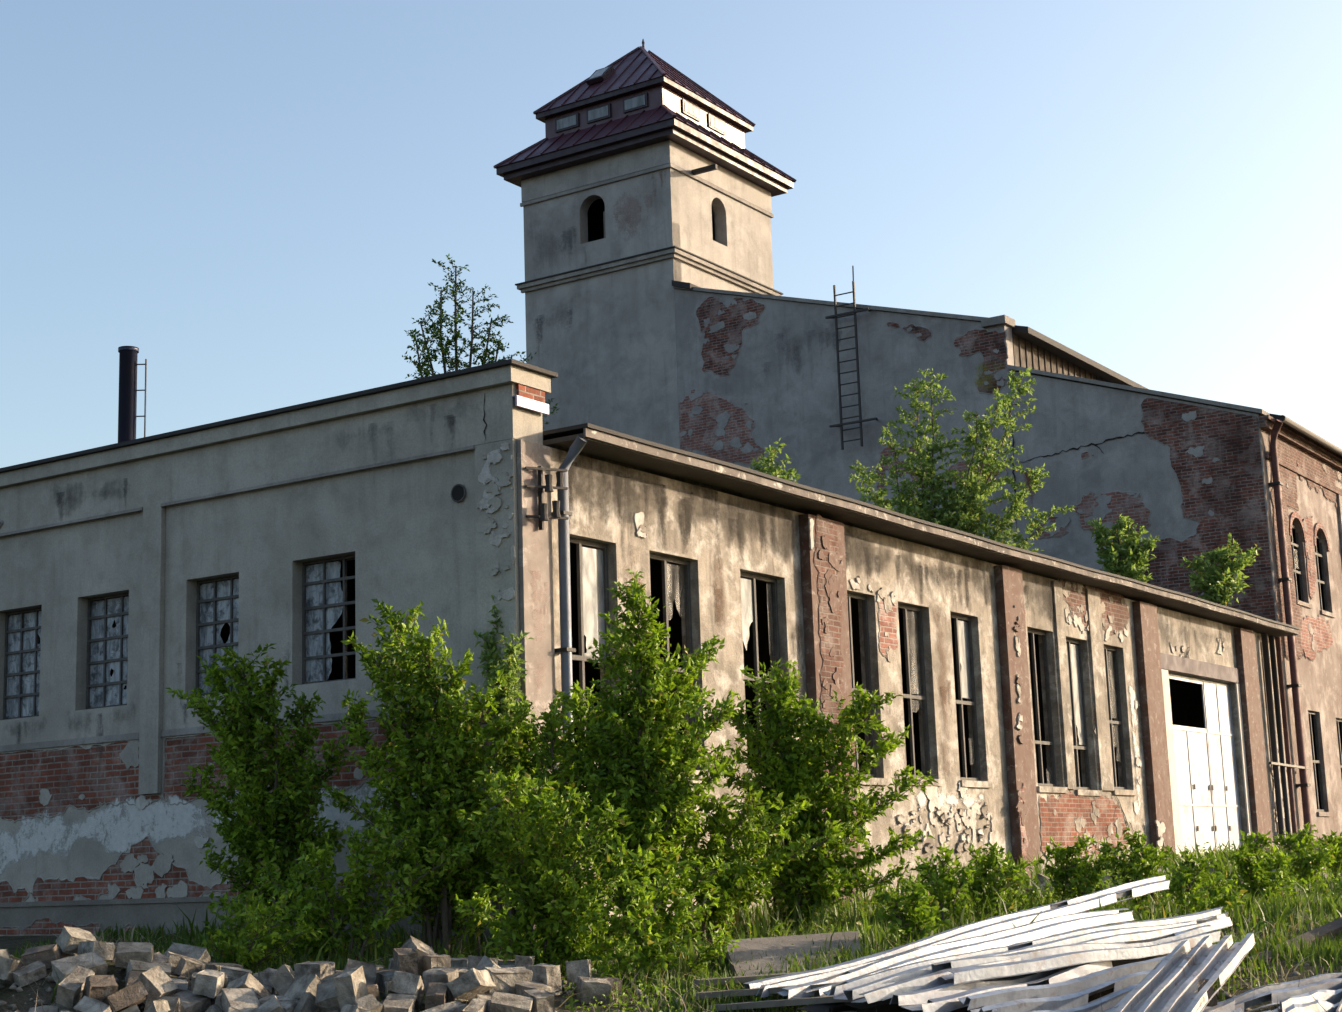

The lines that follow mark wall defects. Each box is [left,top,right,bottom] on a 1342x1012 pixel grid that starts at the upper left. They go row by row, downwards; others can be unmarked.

flaking render [0,716,419,937]